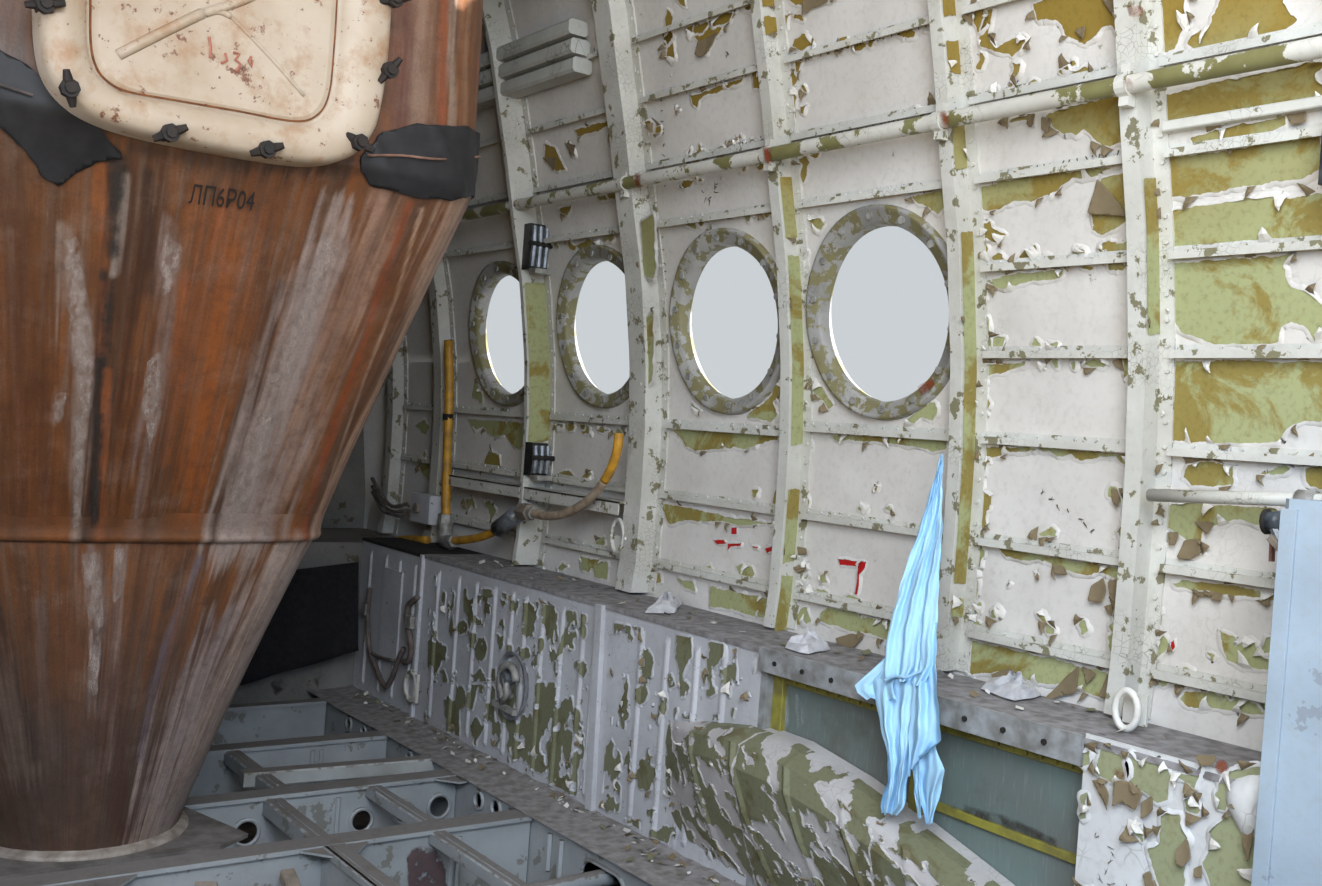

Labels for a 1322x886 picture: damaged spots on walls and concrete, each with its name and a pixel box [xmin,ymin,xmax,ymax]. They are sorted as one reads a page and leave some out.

peeling [1157,0,1303,57]
peeling [643,117,663,138]
peeling [636,211,659,282]
peeling [638,307,656,389]
peeling [657,0,1128,717]
peeling [1144,58,1322,607]
peeling [352,486,1000,886]
peeling [1149,605,1271,726]
peeling [1077,722,1261,886]